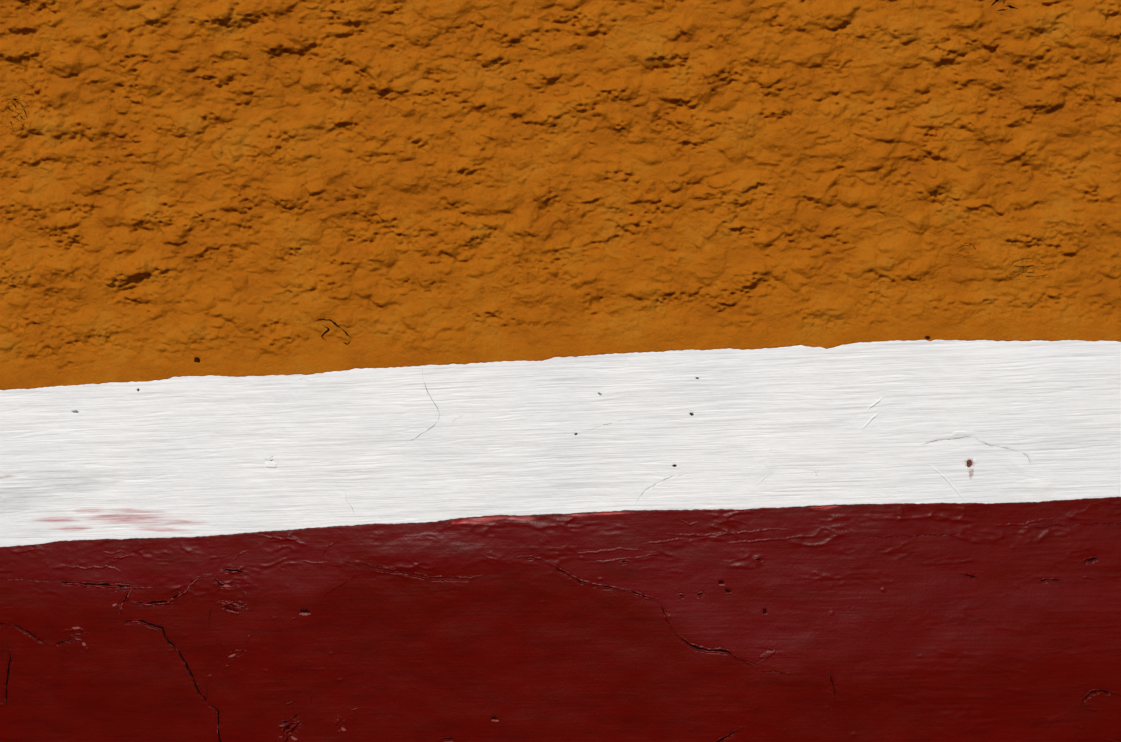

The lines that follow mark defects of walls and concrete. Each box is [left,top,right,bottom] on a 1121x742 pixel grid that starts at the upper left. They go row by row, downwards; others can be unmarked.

crack [0,550,252,742]